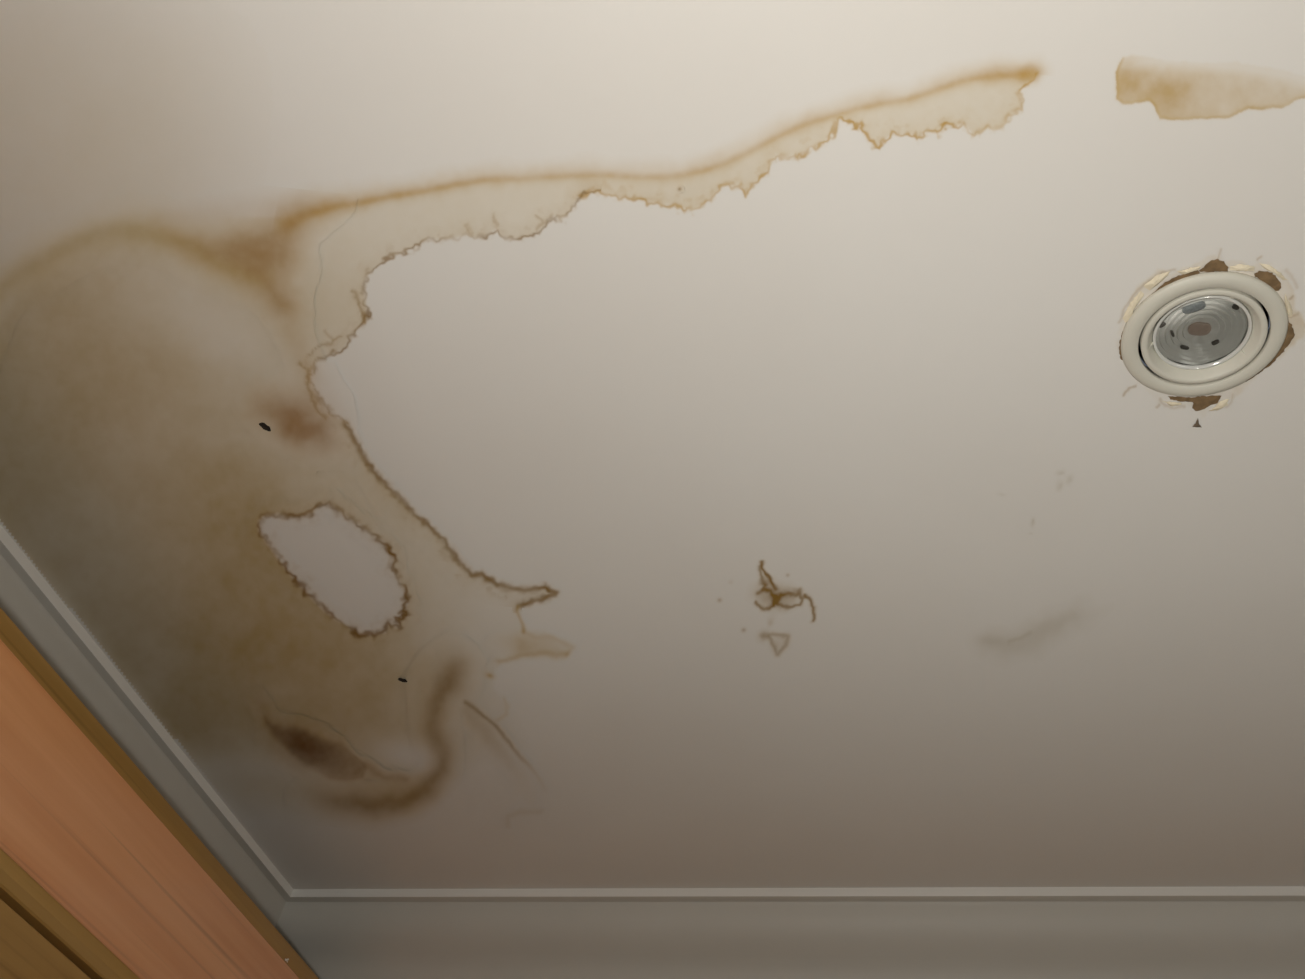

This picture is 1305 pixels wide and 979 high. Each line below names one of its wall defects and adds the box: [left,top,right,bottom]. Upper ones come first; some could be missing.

damp [1112,53,1305,123]
damp [0,0,1056,833]
peeling [1114,247,1305,427]